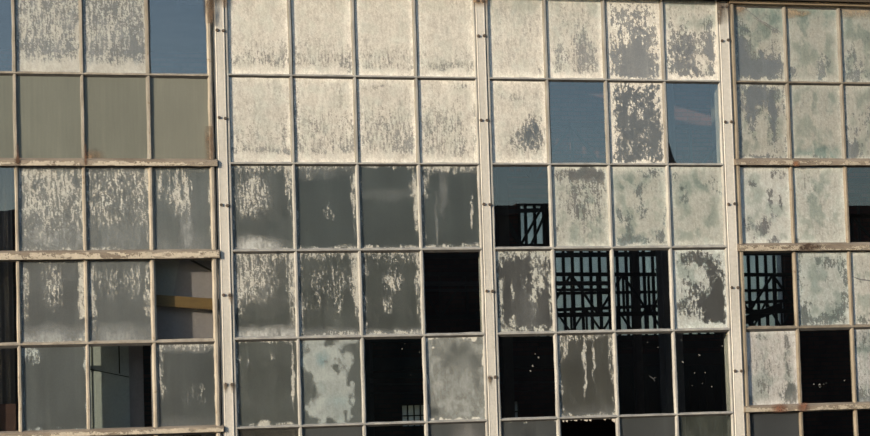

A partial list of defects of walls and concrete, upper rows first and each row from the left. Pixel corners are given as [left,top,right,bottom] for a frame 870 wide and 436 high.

rust [205,0,227,24]
peeling [0,160,219,397]
peeling [733,8,870,412]